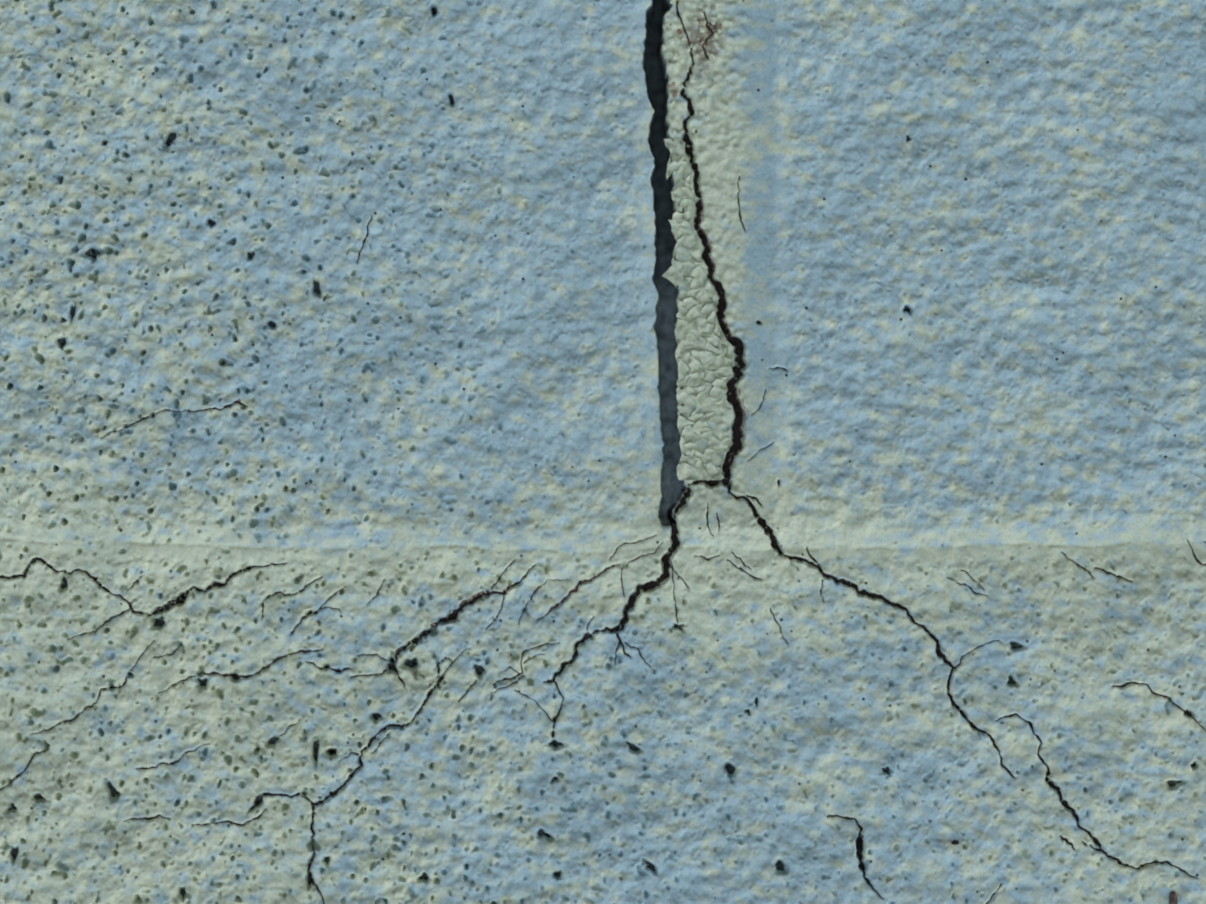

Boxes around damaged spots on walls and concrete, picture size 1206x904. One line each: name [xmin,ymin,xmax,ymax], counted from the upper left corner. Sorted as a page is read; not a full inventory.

crack [357,216,372,261]
crack [100,400,248,439]
crack [492,0,1206,879]
crack [0,557,287,790]
crack [158,559,537,694]
crack [125,647,469,904]
crack [827,815,884,900]